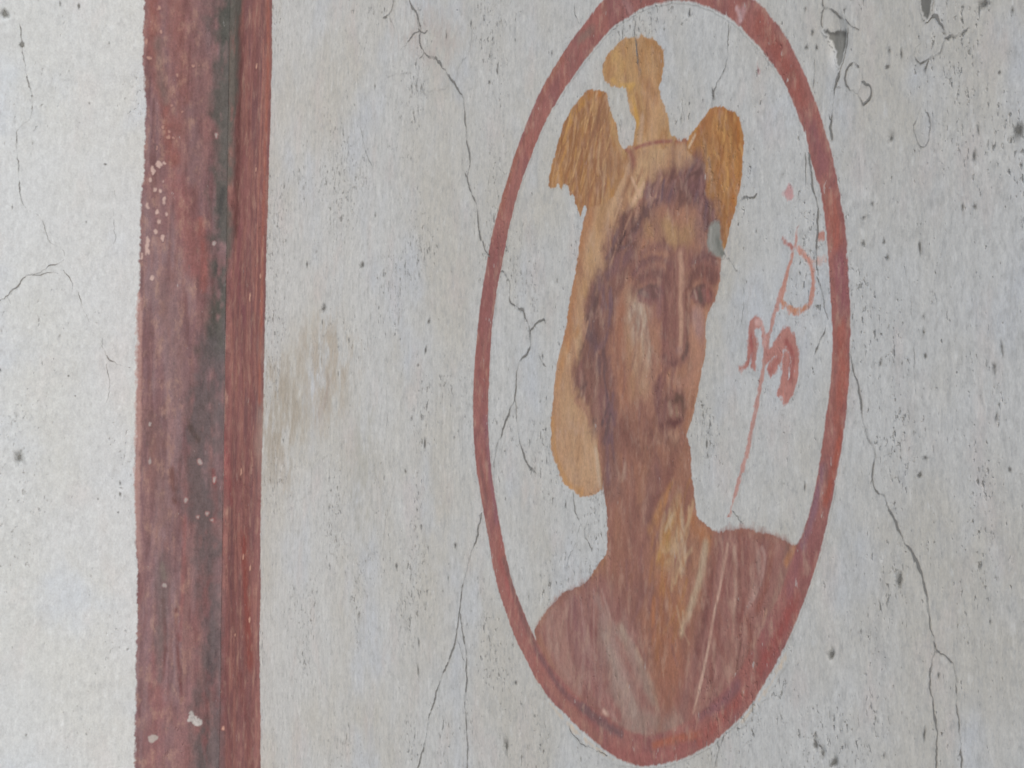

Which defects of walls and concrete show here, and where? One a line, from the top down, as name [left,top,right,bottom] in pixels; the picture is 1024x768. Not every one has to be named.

spalling [805,27,848,73]
spalling [919,0,934,22]
peeling [139,124,176,261]
crack [407,0,503,272]
crack [4,264,81,304]
crack [501,297,546,470]
crack [848,353,862,412]
crack [428,584,468,768]
crack [870,462,963,768]